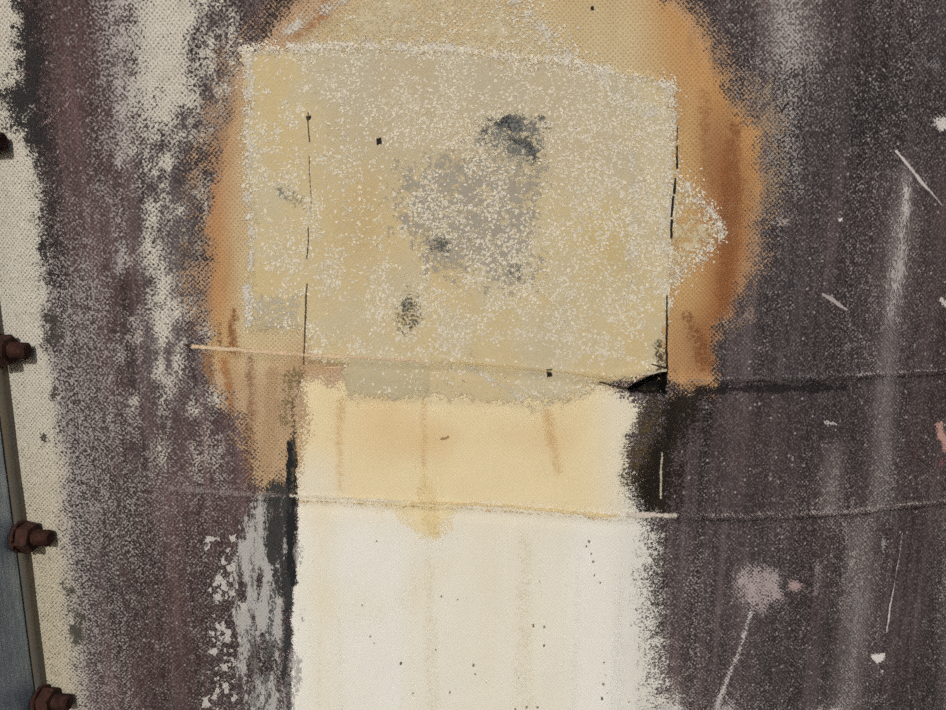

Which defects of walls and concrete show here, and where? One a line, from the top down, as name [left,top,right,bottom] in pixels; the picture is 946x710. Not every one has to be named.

crack [301,284,309,365]
mould [392,286,422,337]
peeling [233,0,728,415]
corrosion [172,0,791,498]
leakage [478,112,551,165]
crack [670,125,678,239]
peeling [202,534,248,710]
leakage [228,366,704,710]